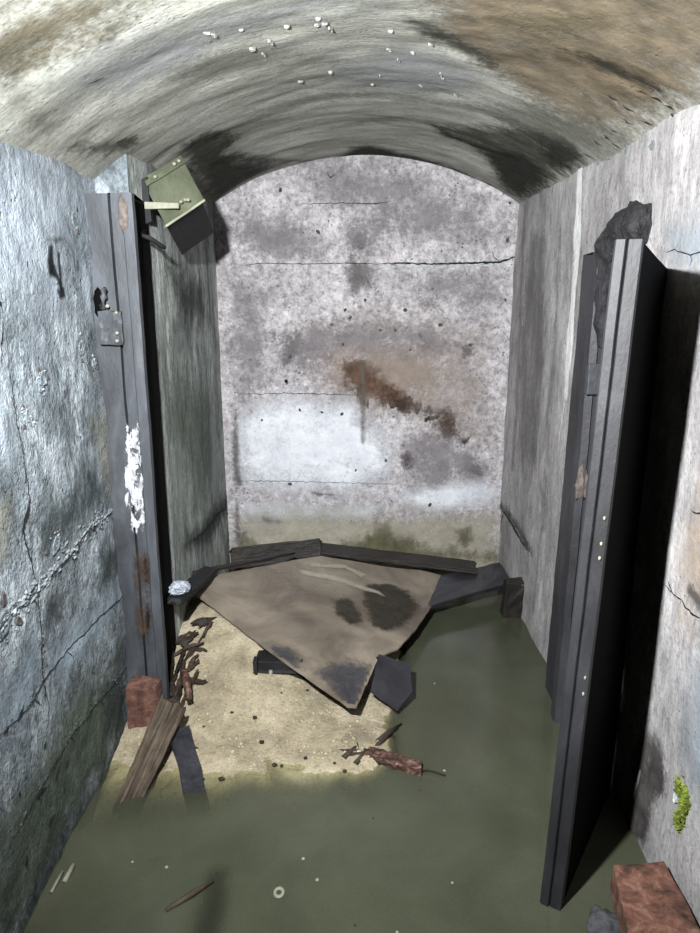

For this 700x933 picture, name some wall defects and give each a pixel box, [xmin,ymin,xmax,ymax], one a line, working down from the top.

water stain [185,131,299,202]
water stain [239,220,306,257]
water stain [328,166,485,250]
water stain [405,0,700,440]
water stain [236,292,266,380]
rust [343,355,428,423]
water stain [233,396,497,569]